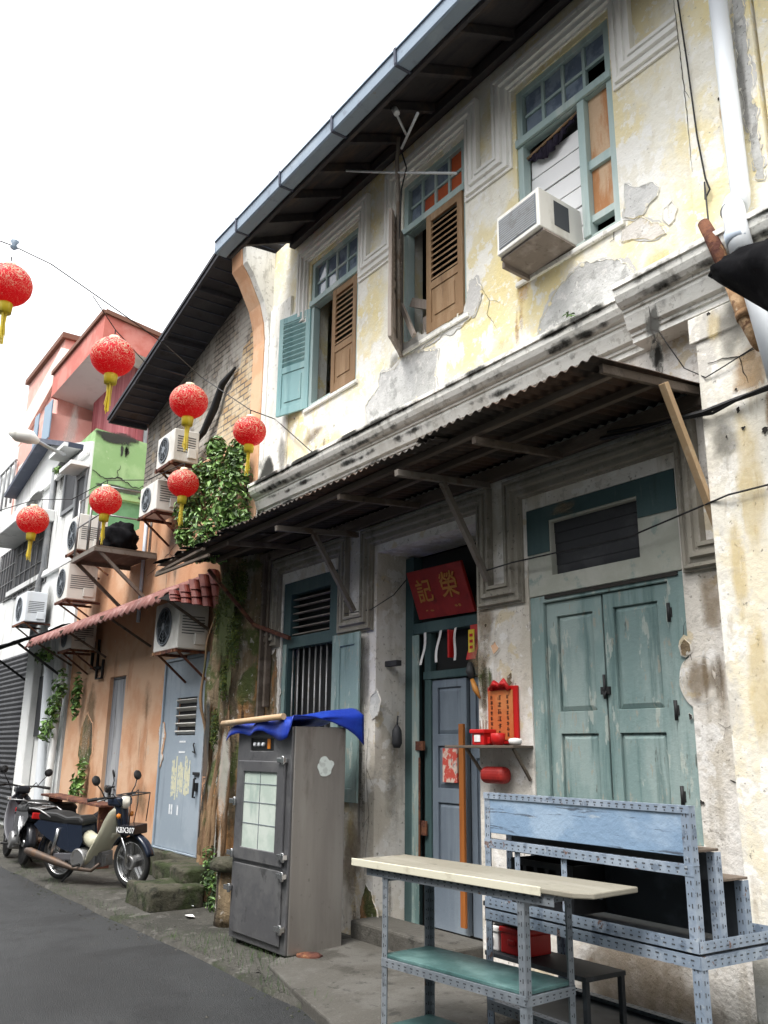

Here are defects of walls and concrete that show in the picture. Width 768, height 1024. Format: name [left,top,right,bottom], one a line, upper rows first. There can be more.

flaking render [621,182,678,243]
flaking render [364,275,482,424]
damp [540,304,607,354]
flaking render [537,257,637,336]
damp [646,305,663,373]
damp [338,401,421,475]
damp [703,582,719,624]
flaking render [678,635,693,657]
damp [689,660,724,697]
damp [198,703,229,837]